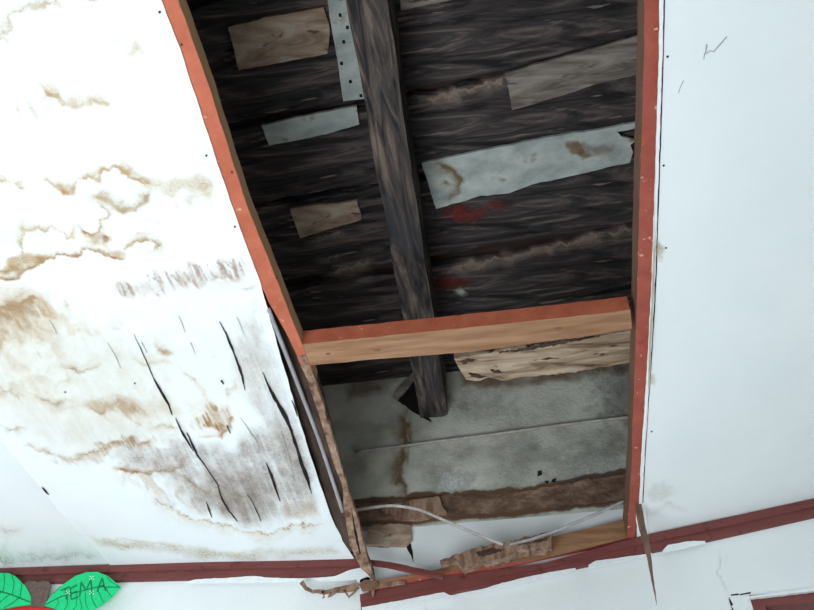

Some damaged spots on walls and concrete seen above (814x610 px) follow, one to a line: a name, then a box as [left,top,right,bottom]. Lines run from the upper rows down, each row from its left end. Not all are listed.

damp [82,165,149,184]
damp [0,219,123,281]
peeling [446,226,632,274]
damp [0,295,48,330]
spalling [499,336,599,354]
crack [134,335,238,522]
damp [196,405,233,437]
crack [219,316,312,501]
flaking render [392,373,432,423]
damp [74,436,208,494]
flaking render [353,468,626,548]
peeling [636,467,649,537]